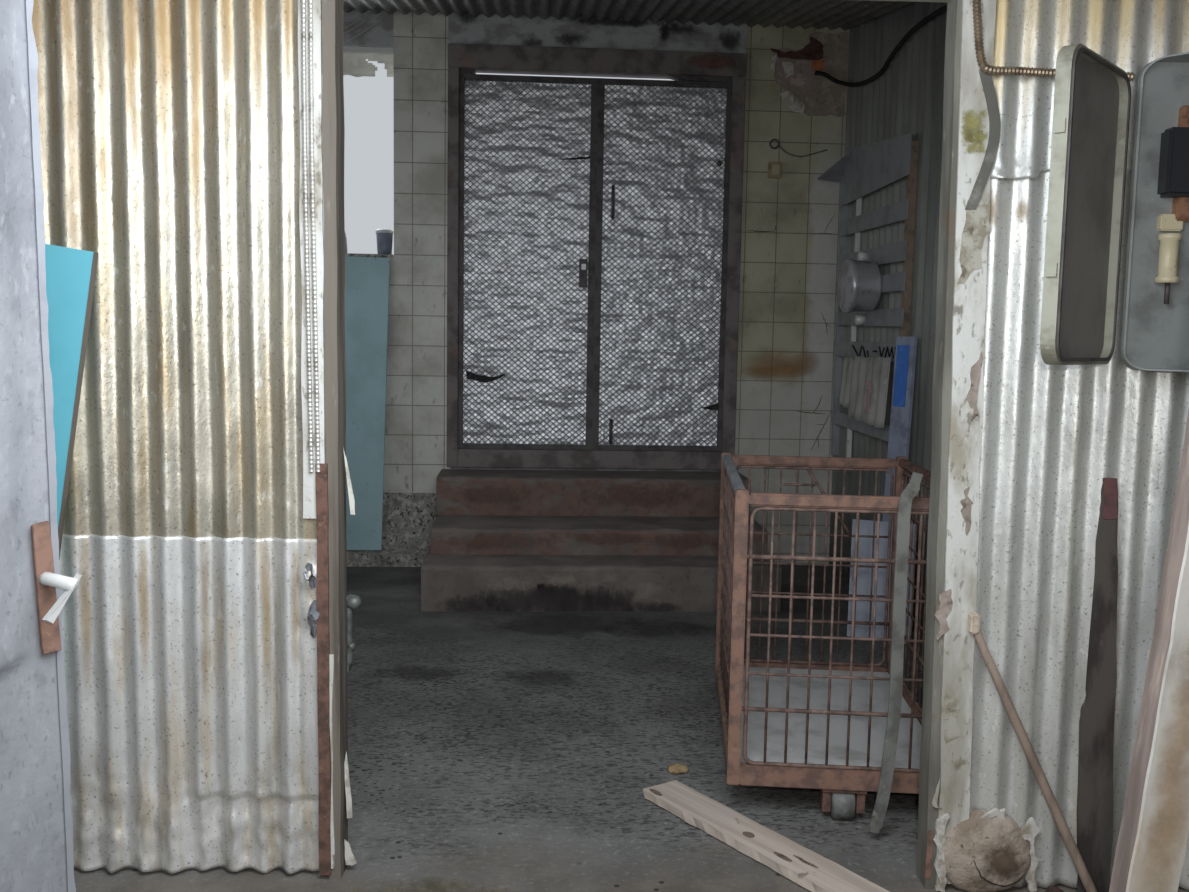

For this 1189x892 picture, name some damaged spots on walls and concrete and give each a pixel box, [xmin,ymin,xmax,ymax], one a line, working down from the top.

spalling [770,32,849,117]
peeling [957,198,991,284]
peeling [966,351,983,420]
peeling [960,487,973,535]
water stain [451,587,696,635]
peeling [935,589,953,643]